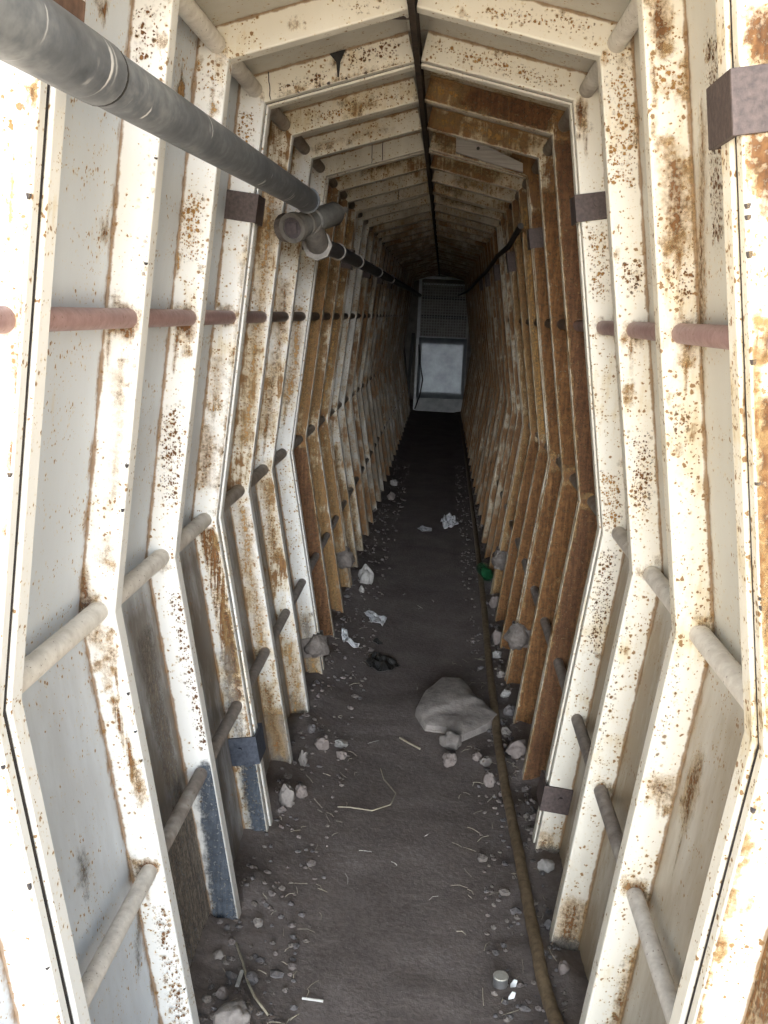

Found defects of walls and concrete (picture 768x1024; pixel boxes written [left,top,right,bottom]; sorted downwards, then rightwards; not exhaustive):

rust [644,0,689,102]
rust [740,6,768,65]
rust [659,106,723,324]
rust [744,133,768,219]
rust [107,324,137,355]
rust [683,344,704,390]
rust [452,83,653,780]
rust [200,527,244,701]
rust [240,507,267,657]
rust [294,446,333,636]
rust [647,758,702,823]
rust [560,900,586,942]